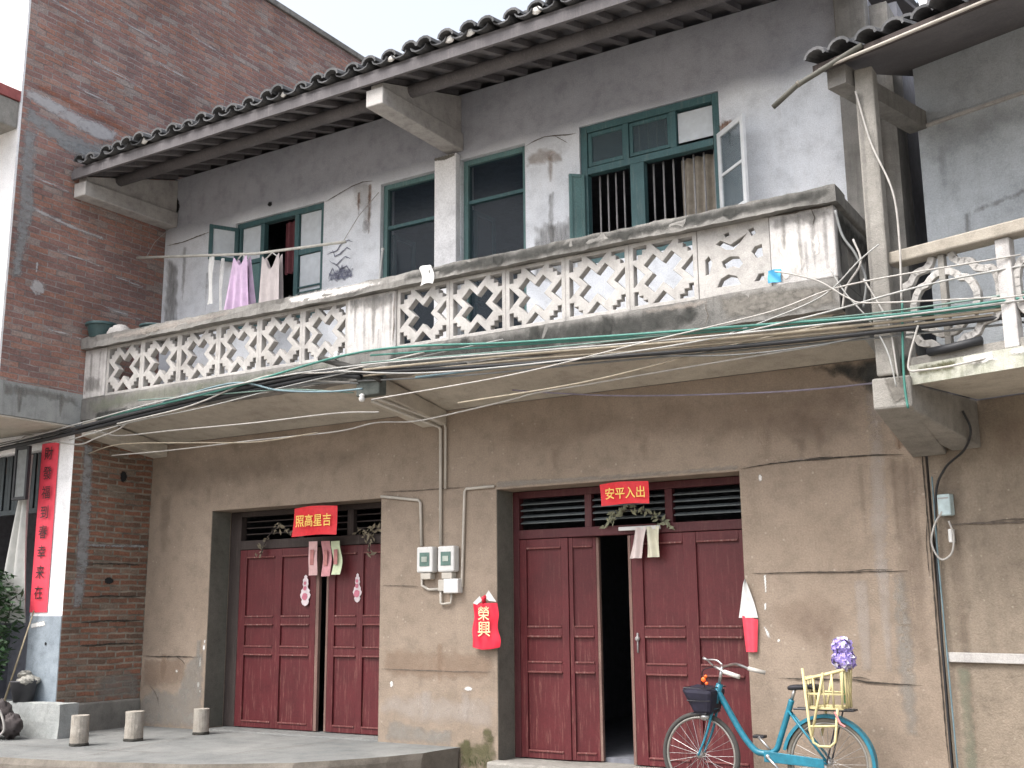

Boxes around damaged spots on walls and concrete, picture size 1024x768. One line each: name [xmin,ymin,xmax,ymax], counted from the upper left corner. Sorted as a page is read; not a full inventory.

damp [408,190,824,278]
crack [743,454,1024,761]